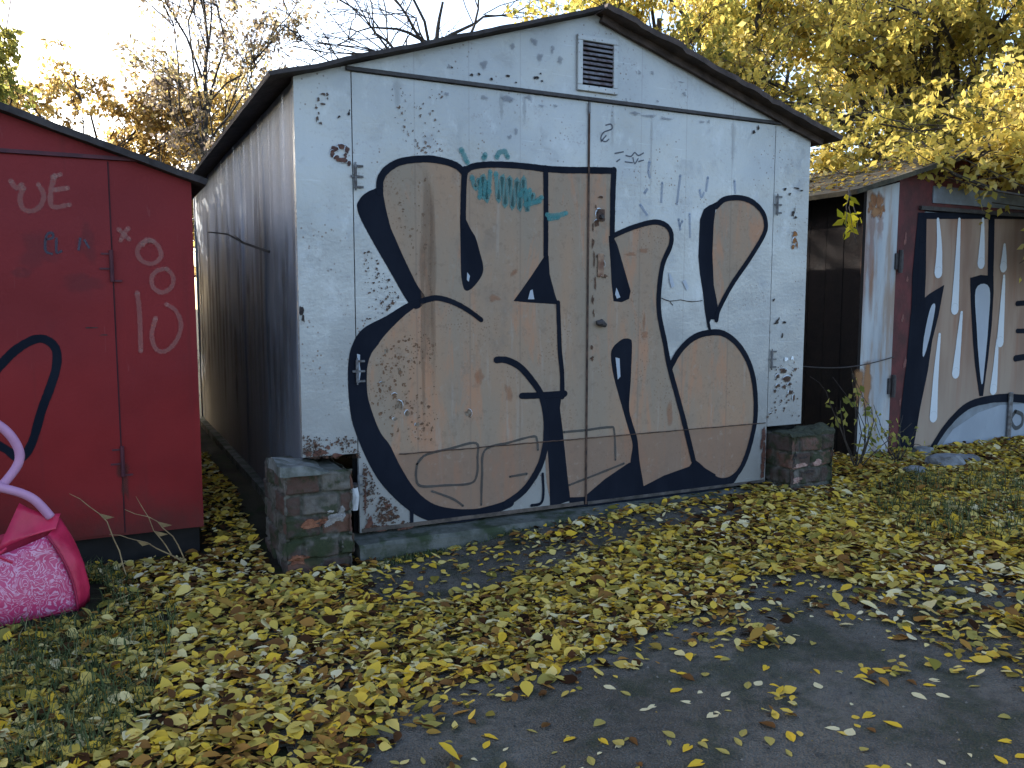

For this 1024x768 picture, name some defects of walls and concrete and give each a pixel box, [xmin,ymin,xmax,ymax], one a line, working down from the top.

rust [868,193,885,217]
rust [363,251,399,321]
rust [302,435,414,534]